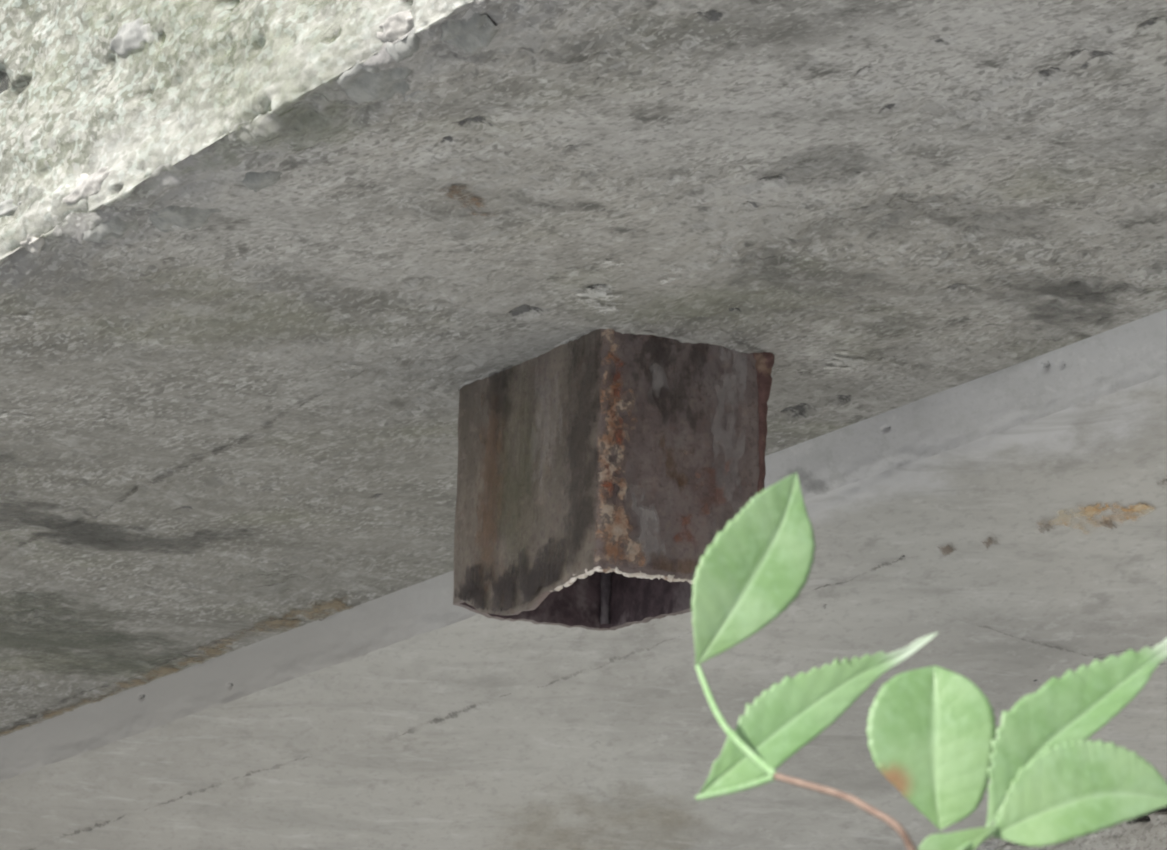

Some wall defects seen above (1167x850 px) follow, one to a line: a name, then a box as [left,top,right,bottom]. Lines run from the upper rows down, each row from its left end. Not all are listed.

corrosion [594,329,664,566]
damp [0,502,247,553]
corrosion [455,539,565,611]
damp [0,592,188,675]
corrosion [0,598,350,735]